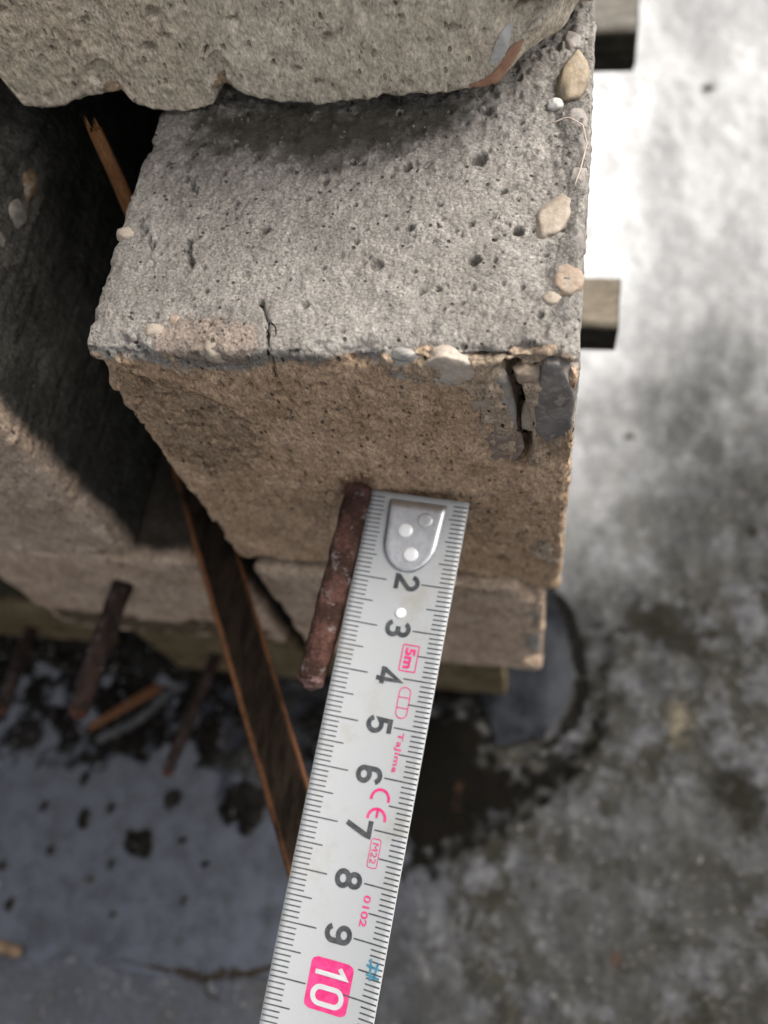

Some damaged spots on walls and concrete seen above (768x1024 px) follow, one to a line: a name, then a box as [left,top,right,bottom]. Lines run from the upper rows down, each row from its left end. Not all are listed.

crack [263,307,277,376]
spalling [379,344,578,466]